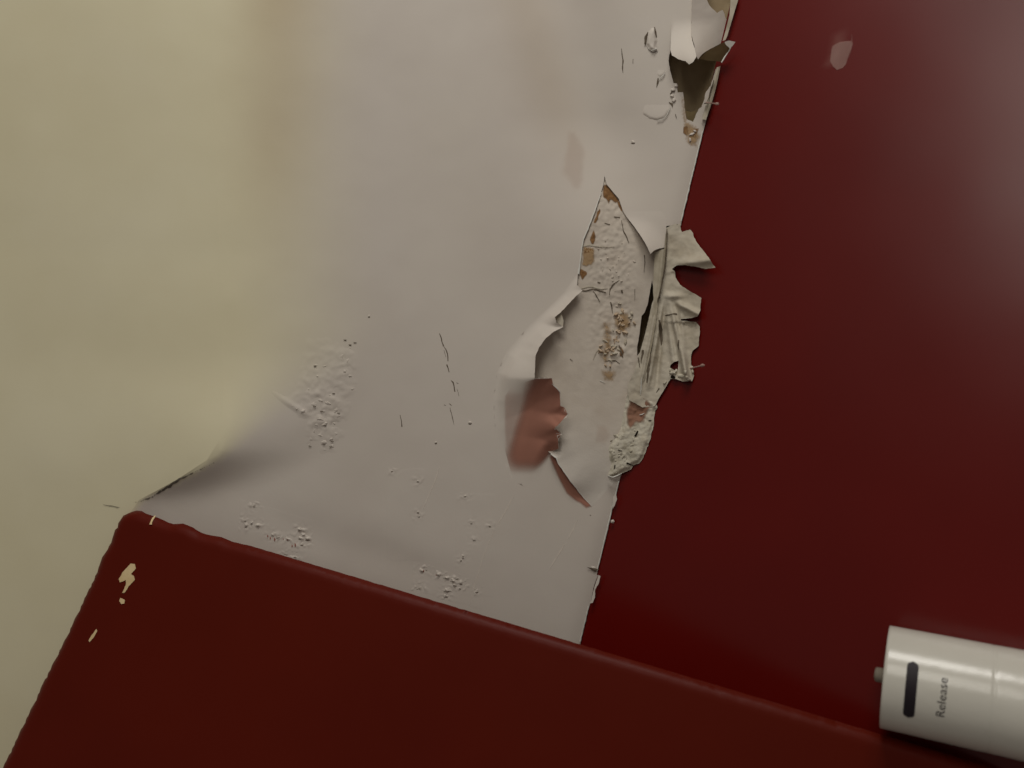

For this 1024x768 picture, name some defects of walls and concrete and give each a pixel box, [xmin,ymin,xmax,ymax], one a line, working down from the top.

spalling [643,0,738,144]
peeling [493,176,666,516]
peeling [119,564,136,604]